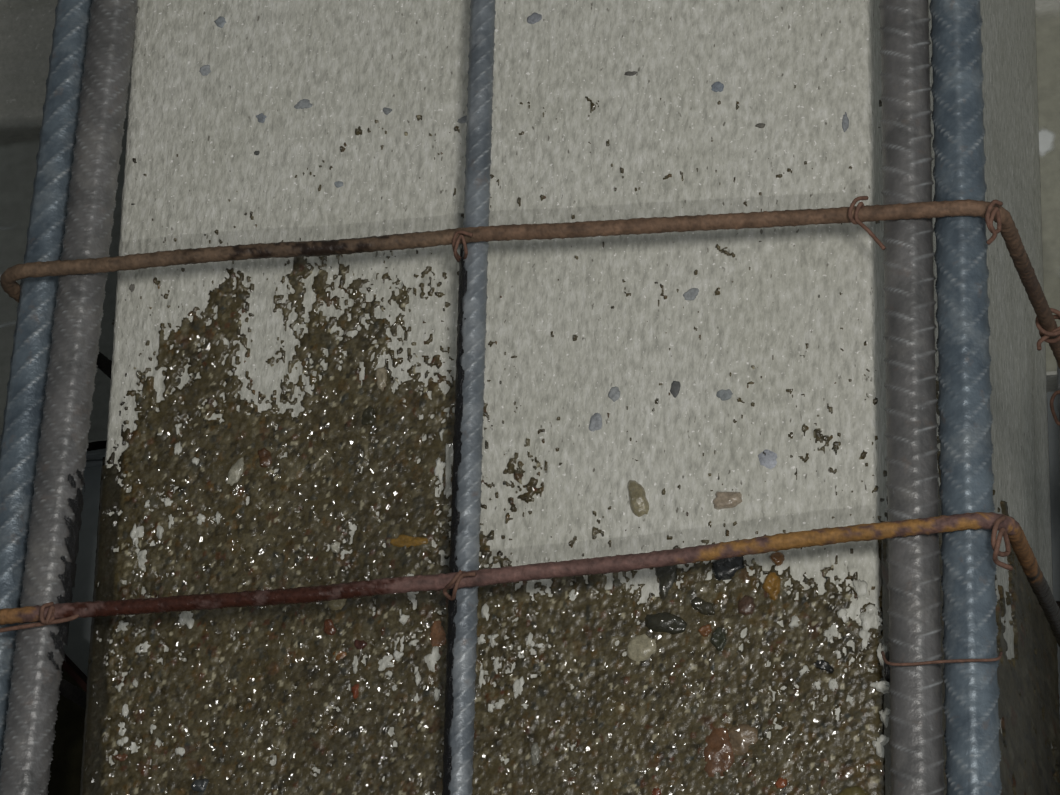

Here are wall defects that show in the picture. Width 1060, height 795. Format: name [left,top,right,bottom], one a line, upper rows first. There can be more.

spalling [340,120,387,152]
spalling [449,0,499,228]
spalling [878,0,987,205]
spalling [93,242,562,601]
spalling [592,506,611,547]
spalling [625,480,649,531]
spalling [701,473,742,545]
spalling [788,398,841,480]
spalling [836,216,1009,522]
spalling [80,529,1060,795]